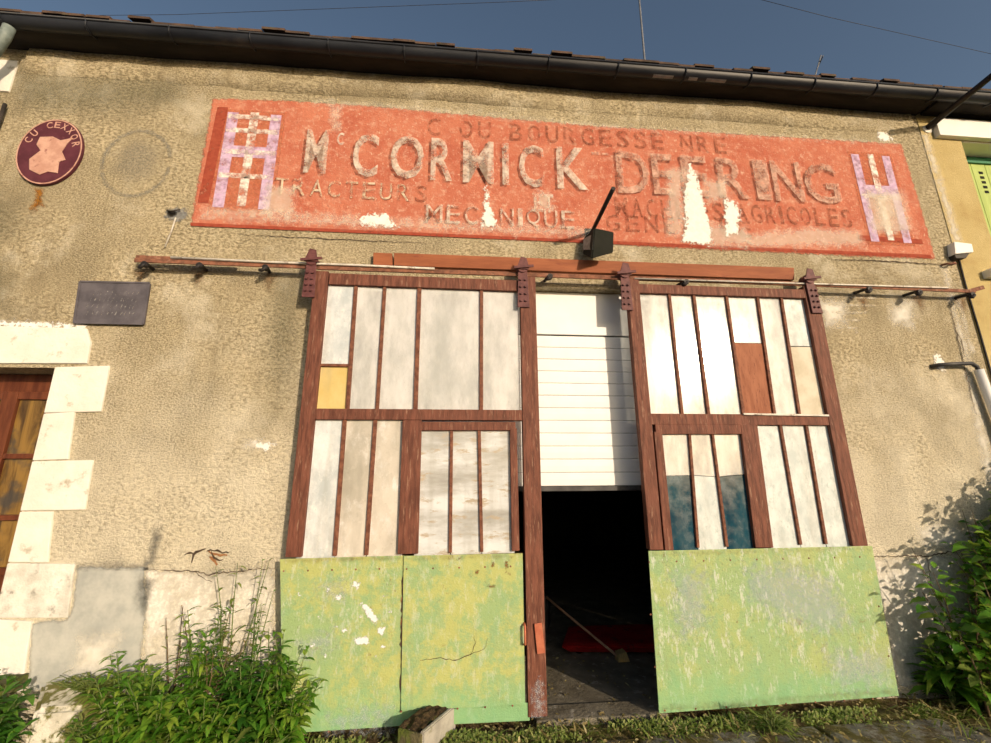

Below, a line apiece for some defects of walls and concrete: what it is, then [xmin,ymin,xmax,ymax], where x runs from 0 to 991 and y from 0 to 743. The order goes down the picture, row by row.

peeling [353,213,400,228]
peeling [472,185,497,230]
peeling [670,163,741,247]
crack [148,548,275,582]